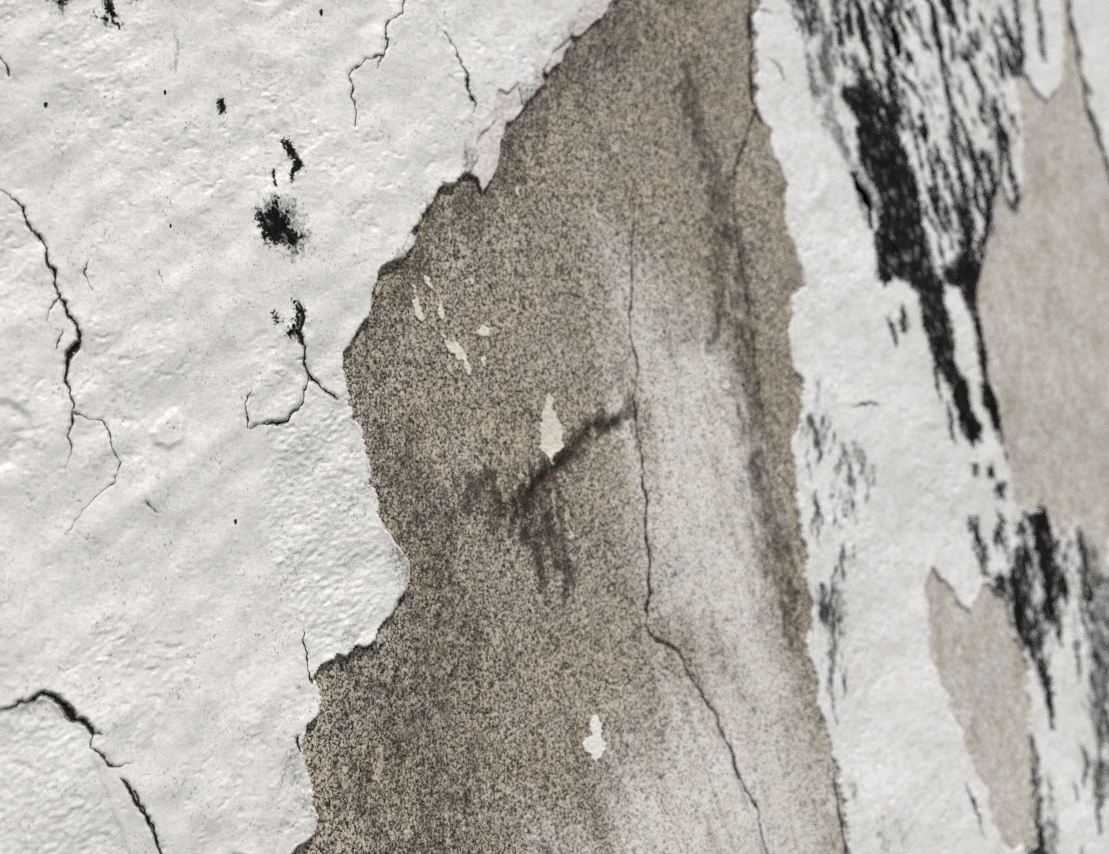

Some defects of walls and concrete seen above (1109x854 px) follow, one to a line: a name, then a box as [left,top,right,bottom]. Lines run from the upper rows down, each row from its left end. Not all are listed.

crack [0,691,163,854]
mould [252,169,306,263]
crack [245,299,338,429]
mould [280,136,305,182]
crack [348,0,405,126]
leakage [334,406,634,854]
peeling [292,0,848,854]
crack [628,192,768,854]
mould [787,0,1049,462]
peeling [924,568,1035,850]
mould [963,462,1109,832]
peeling [977,0,1109,593]